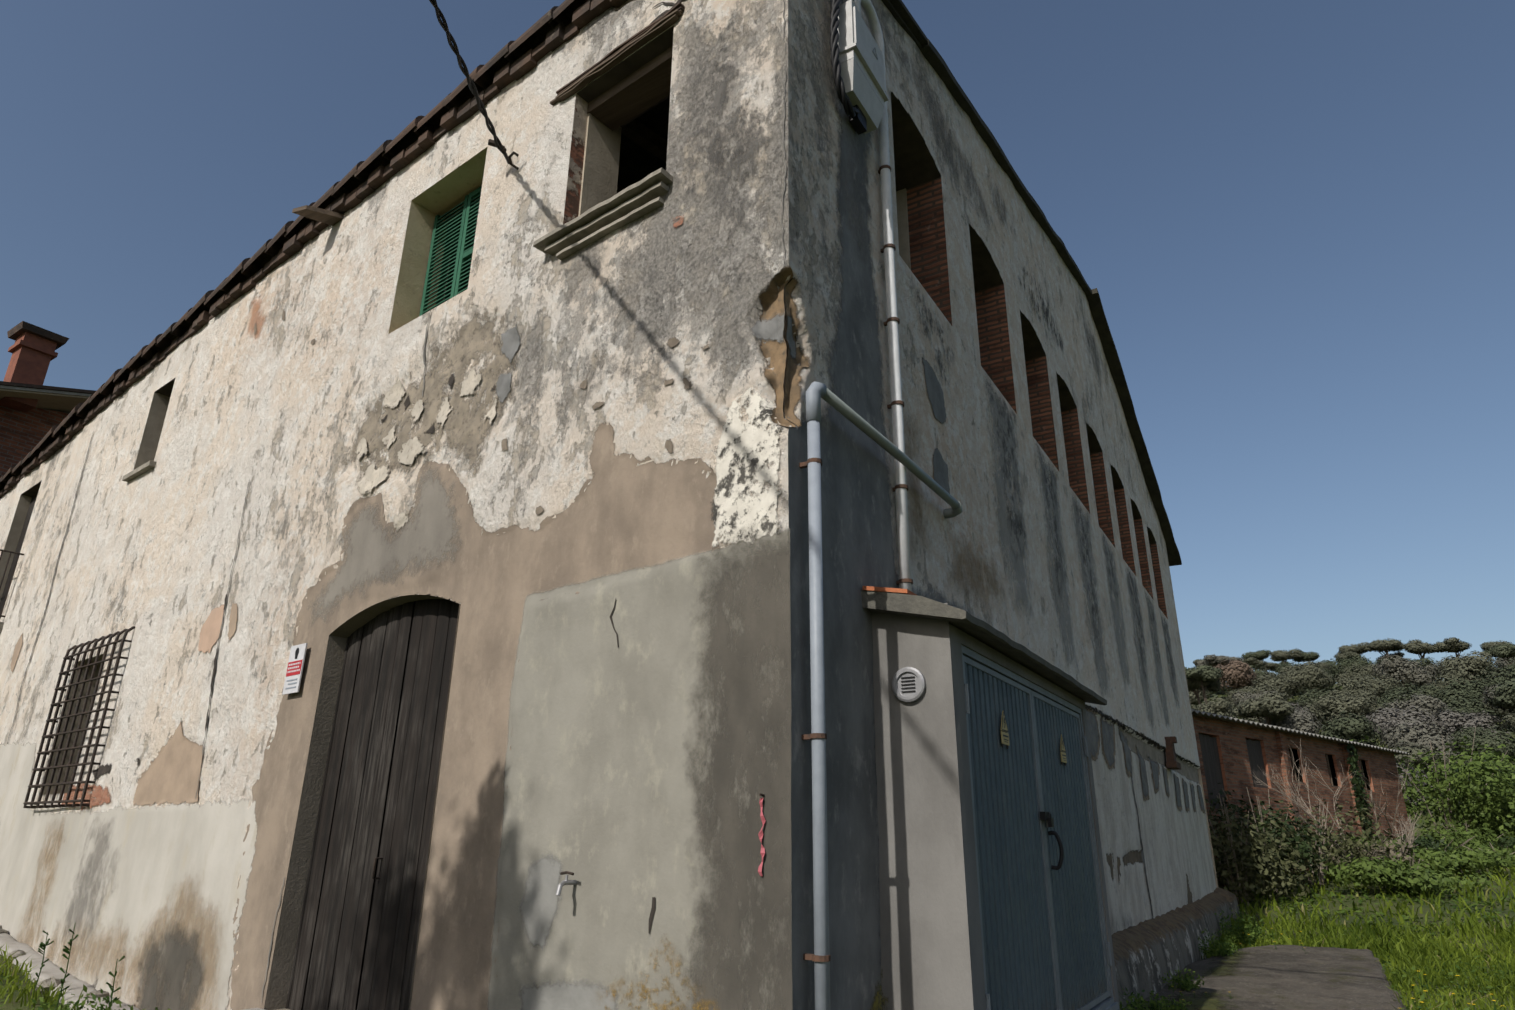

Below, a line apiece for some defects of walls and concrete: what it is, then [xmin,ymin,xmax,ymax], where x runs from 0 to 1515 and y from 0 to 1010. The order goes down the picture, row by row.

peeling [230,265,810,1010]
damp [1076,507,1174,678]
flaking render [61,764,111,811]
peeling [133,719,203,806]
peeling [1085,705,1206,814]
spalling [1106,850,1143,883]
damp [47,837,214,1010]